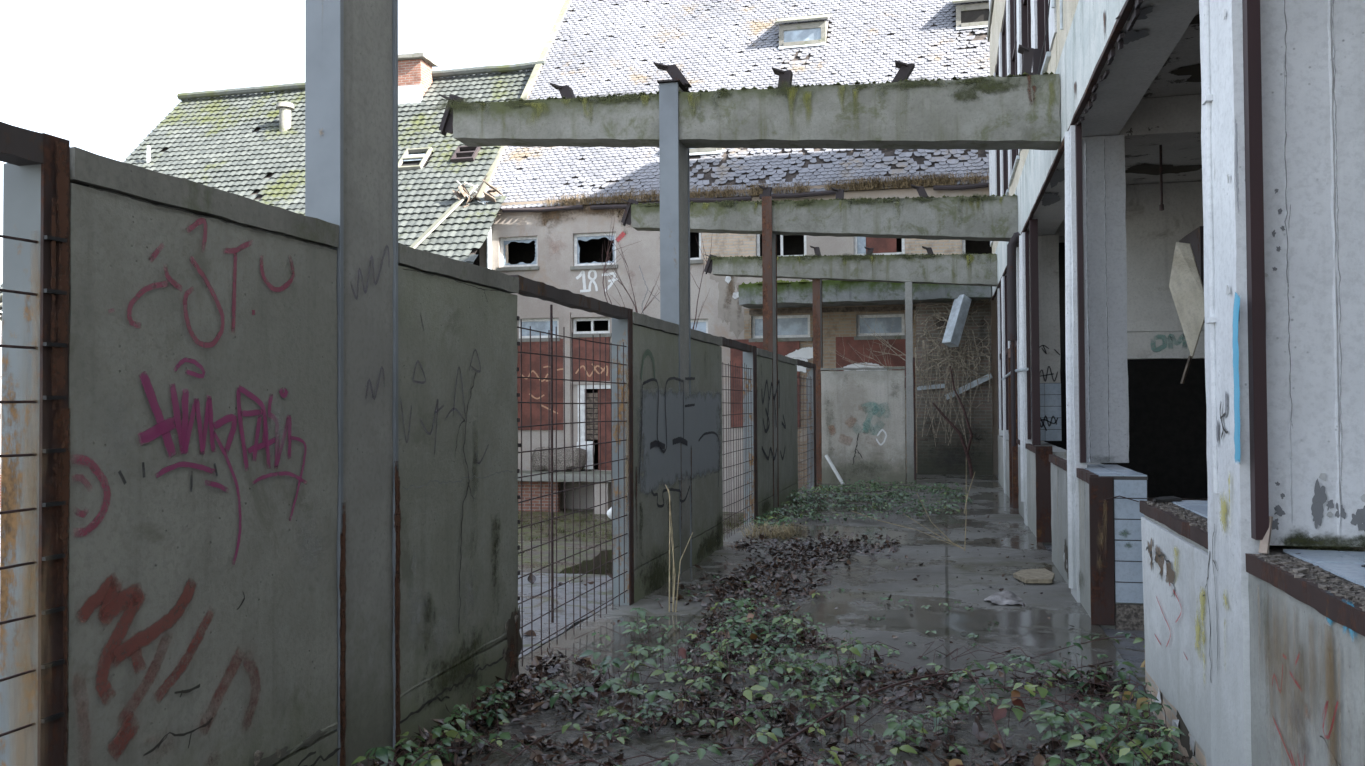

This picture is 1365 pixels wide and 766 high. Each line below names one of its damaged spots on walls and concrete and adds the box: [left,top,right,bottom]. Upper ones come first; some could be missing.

rust [51,141,71,753]
peeling [1311,473,1365,532]
rust [339,504,347,766]